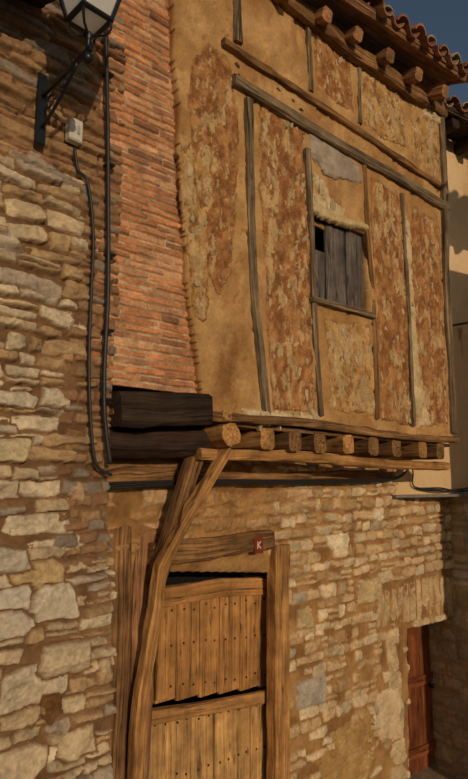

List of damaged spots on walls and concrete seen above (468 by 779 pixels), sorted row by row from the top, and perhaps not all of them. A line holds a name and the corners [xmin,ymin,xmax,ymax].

flaking render [176,46,240,322]
flaking render [256,106,336,432]
flaking render [314,35,440,178]
flaking render [325,177,449,426]